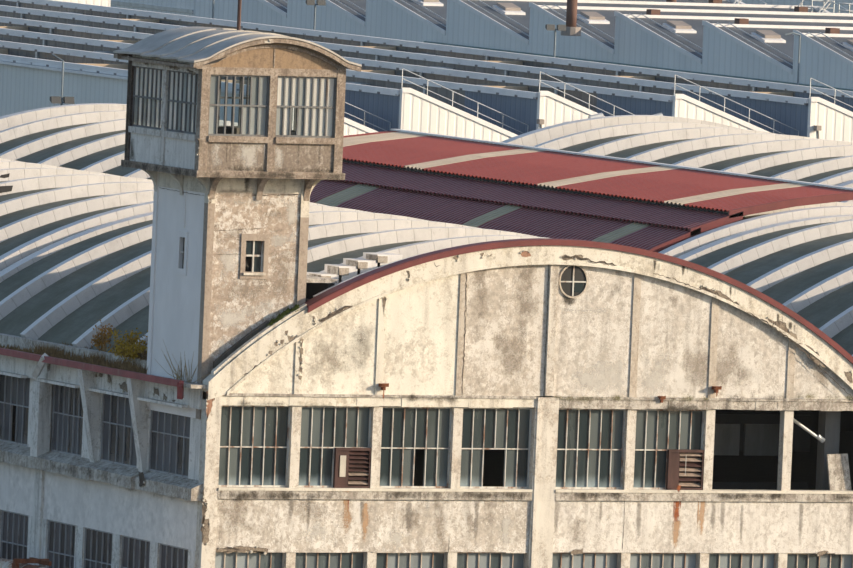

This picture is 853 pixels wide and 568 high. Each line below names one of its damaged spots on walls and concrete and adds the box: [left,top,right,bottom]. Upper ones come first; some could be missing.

crack [548,255,617,281]
spalling [267,330,304,380]
rust [343,491,351,528]
rust [673,485,681,543]
rust [697,501,705,533]